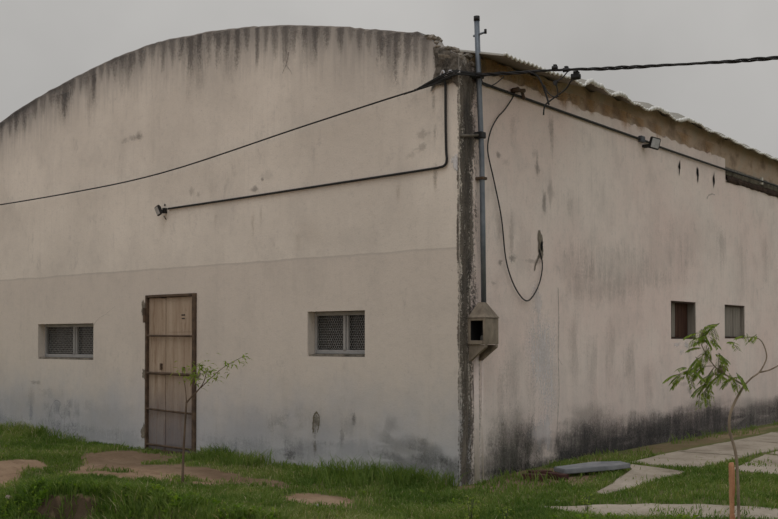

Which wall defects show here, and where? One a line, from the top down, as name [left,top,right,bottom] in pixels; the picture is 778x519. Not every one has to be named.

leakage [560,409,778,461]